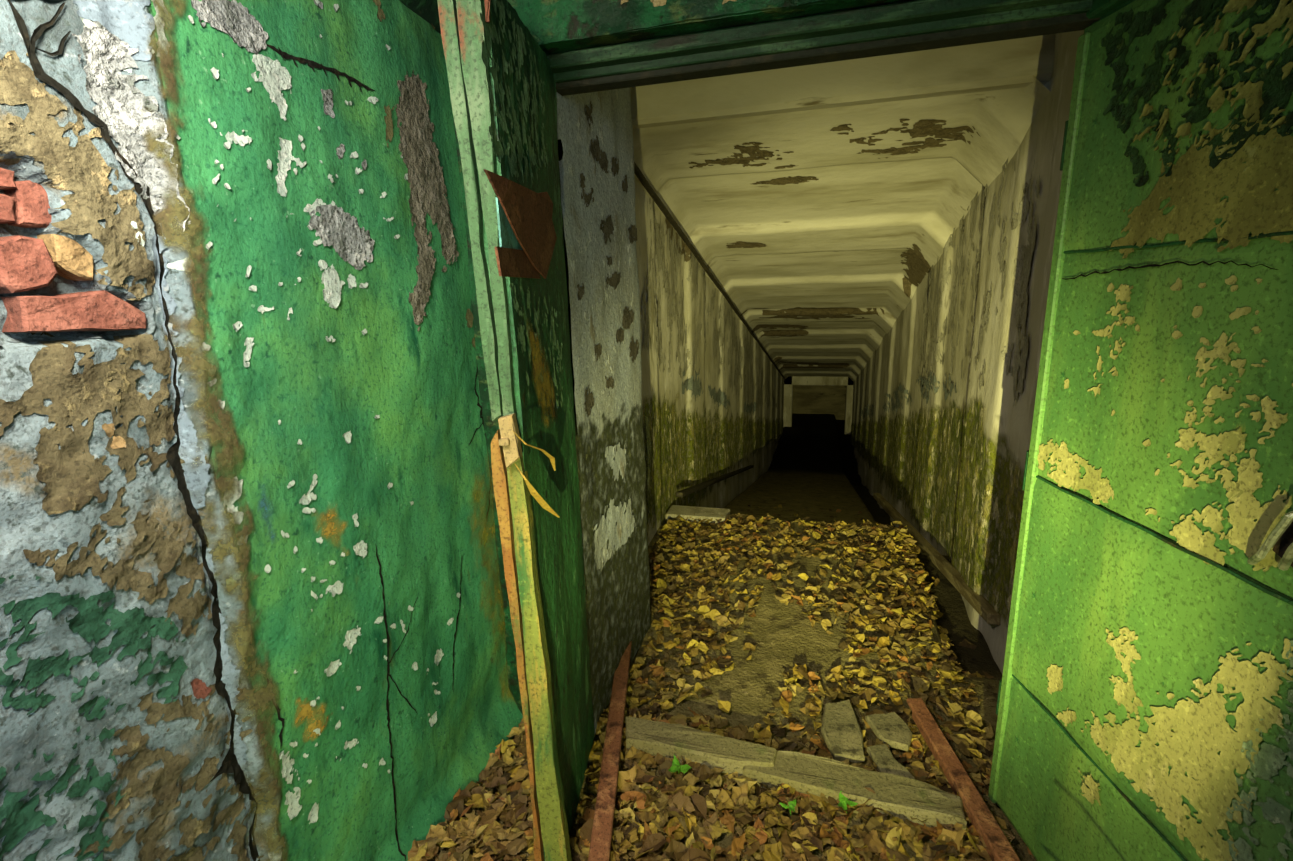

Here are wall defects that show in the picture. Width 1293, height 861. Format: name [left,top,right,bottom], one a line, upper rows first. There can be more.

peeling [267,135,367,197]
crack [267,44,375,94]
flaking render [286,198,374,309]
flaking render [317,70,459,331]
peeling [1101,0,1293,258]
crack [8,0,260,861]
peeling [0,0,293,861]
peeling [593,442,637,572]
peeling [1037,439,1114,504]
peeling [1145,306,1292,572]
peeling [279,706,359,824]
peeling [1057,627,1293,861]